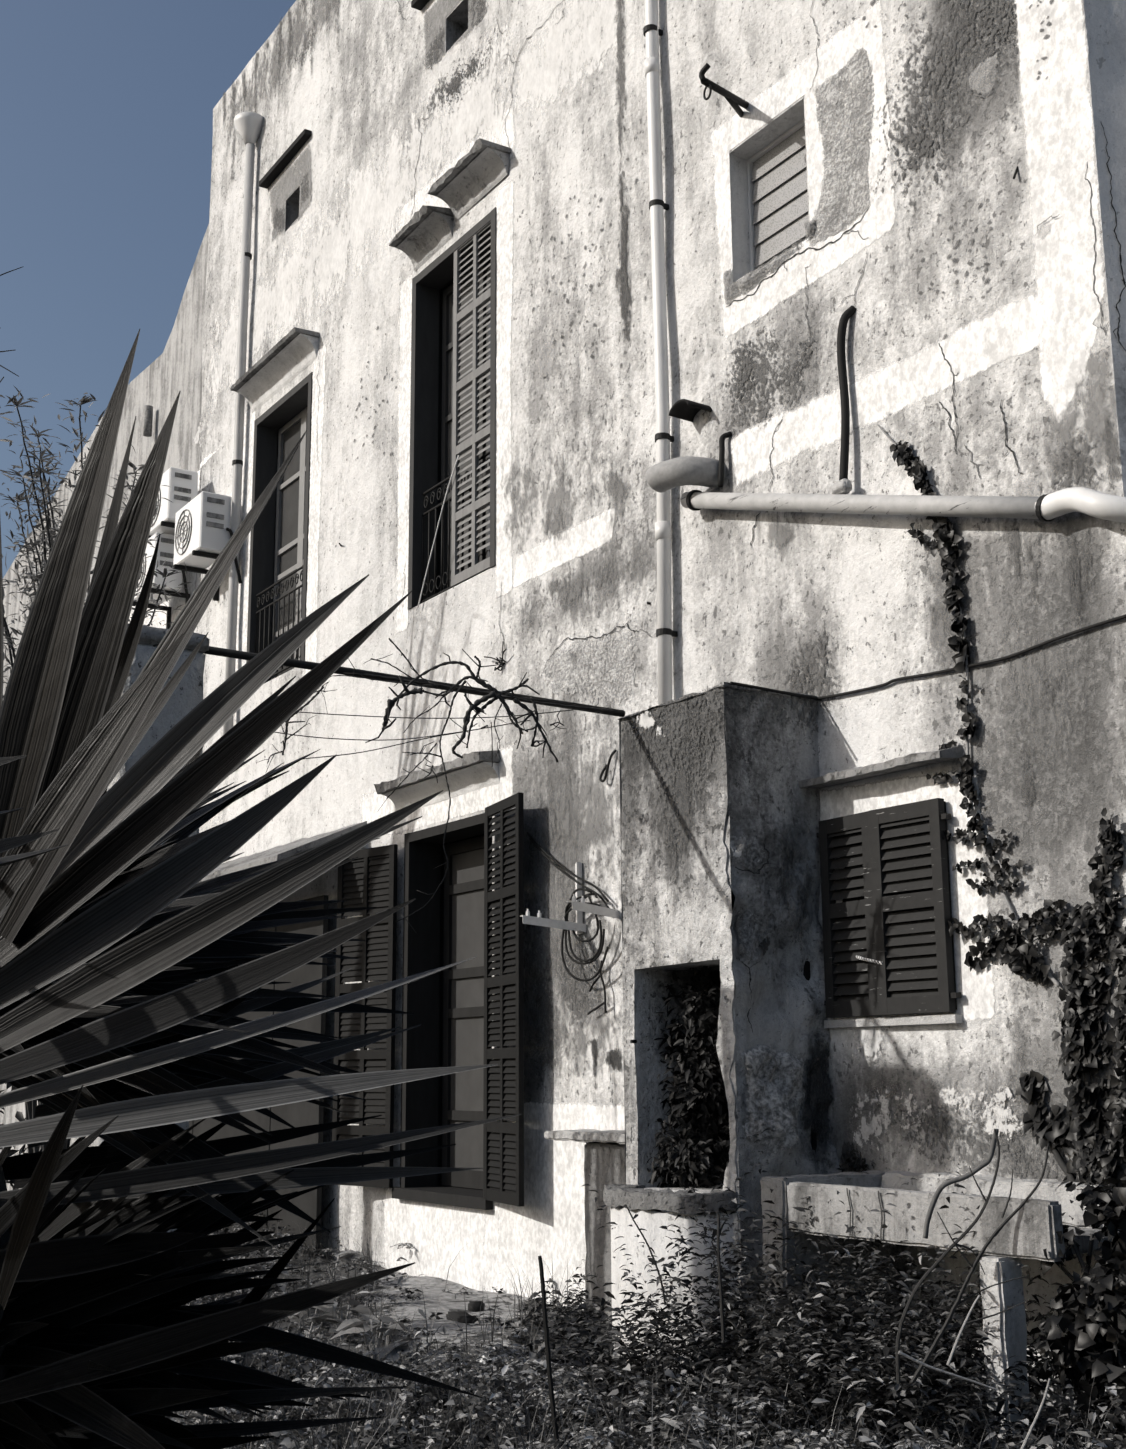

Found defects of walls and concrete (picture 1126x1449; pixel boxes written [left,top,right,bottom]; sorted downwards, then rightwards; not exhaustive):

damp [615,0,632,341]
damp [873,0,1020,212]
crack [1035,123,1126,351]
crack [939,344,1023,478]
damp [524,622,840,1089]
peeling [849,1084,1023,1151]